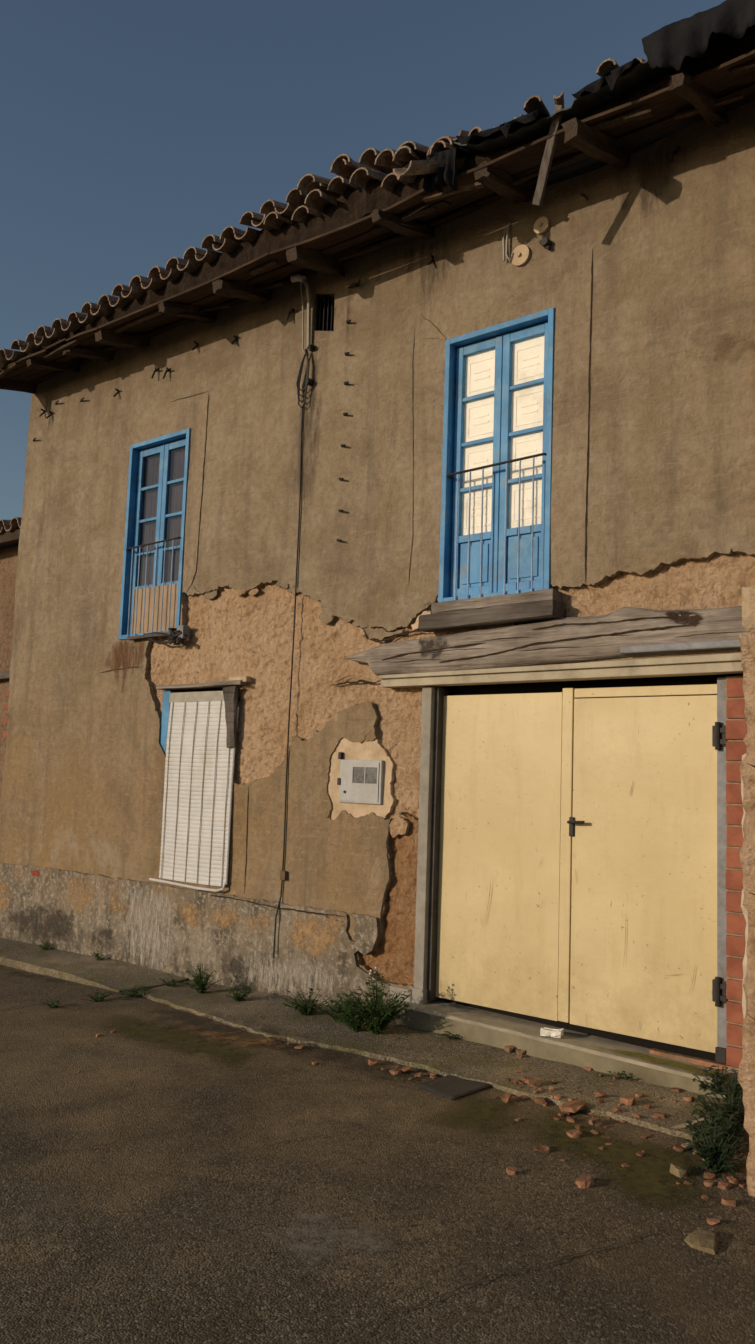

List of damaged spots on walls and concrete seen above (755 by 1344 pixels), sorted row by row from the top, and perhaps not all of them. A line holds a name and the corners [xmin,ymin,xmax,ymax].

flaking render [555,553,755,618]
flaking render [149,581,485,985]
damp [0,878,93,939]
damp [110,890,197,966]
damp [228,917,340,989]